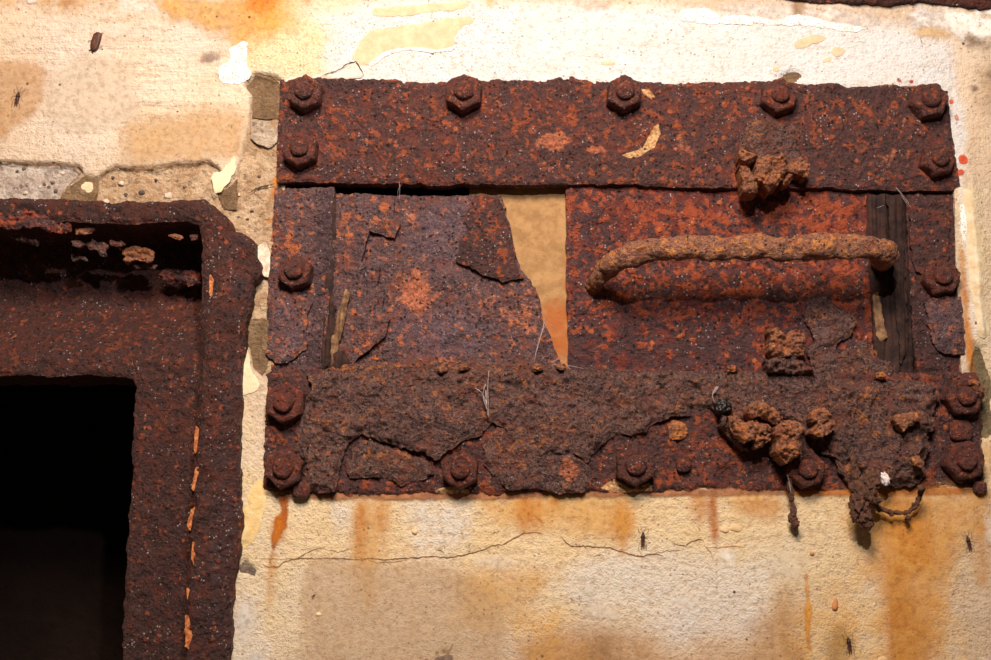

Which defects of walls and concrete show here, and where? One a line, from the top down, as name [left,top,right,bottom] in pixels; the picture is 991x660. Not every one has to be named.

corrosion [159,0,251,39]
spalling [0,2,474,395]
corrosion [0,208,202,287]
corrosion [964,318,974,370]
corrosion [948,419,973,442]
corrosion [271,481,851,549]
crack [265,532,538,568]
crack [561,537,739,557]
corrosion [857,481,987,660]